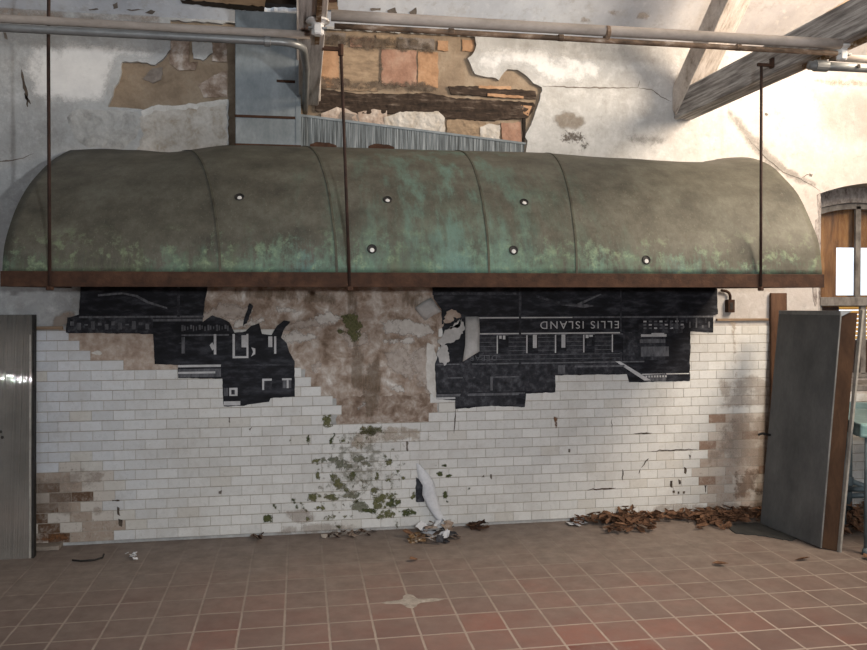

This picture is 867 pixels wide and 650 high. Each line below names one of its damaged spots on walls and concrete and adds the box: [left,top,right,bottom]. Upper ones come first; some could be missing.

flaking render [109,21,235,145]
flaking render [301,30,541,152]
crack [750,141,817,189]
peeling [203,287,442,424]
water stain [735,469,762,497]